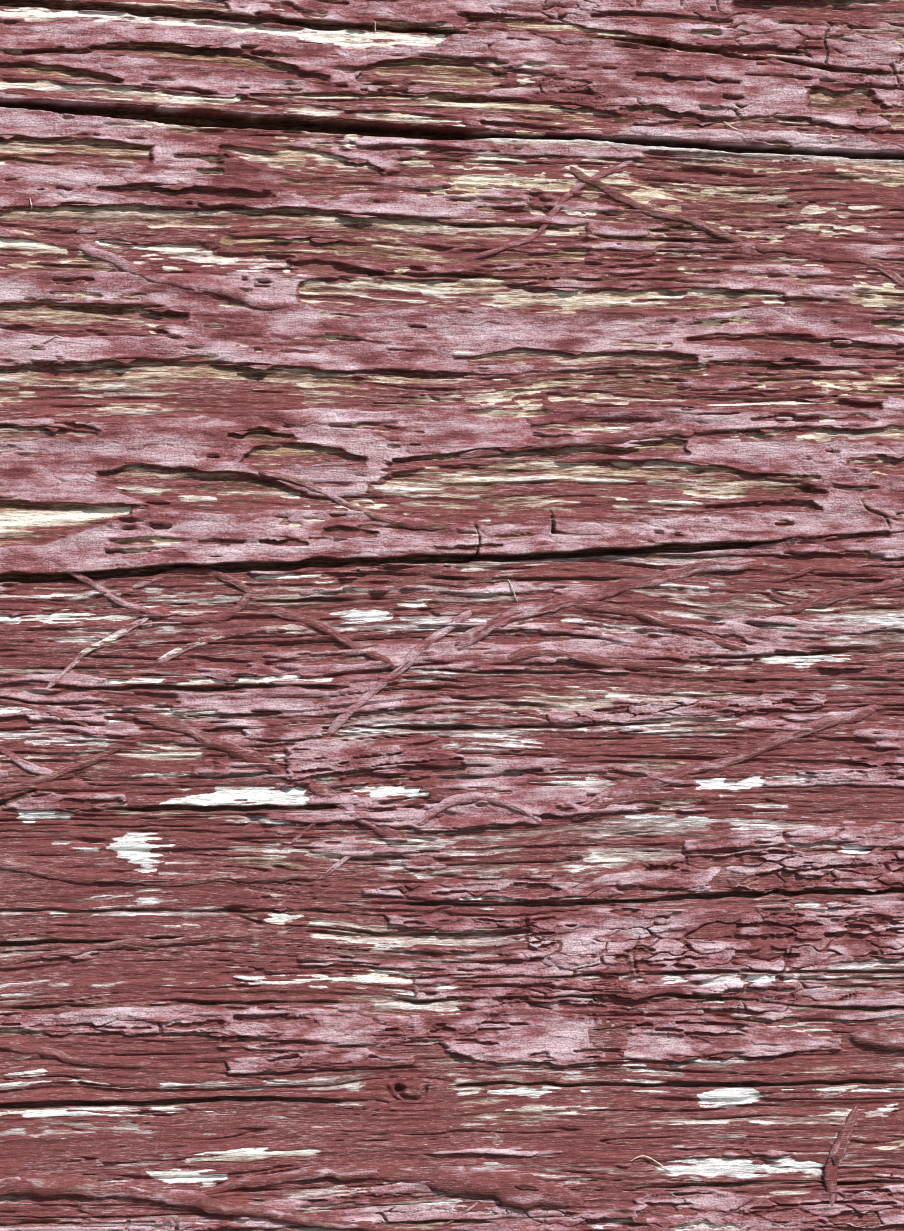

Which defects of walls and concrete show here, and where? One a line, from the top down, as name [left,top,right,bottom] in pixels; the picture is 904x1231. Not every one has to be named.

peeling [0,0,904,133]
crack [581,28,904,76]
peeling [0,184,784,314]
peeling [0,315,904,440]
peeling [372,440,826,524]
crack [0,511,789,603]
peeling [160,783,310,808]
crack [0,827,904,1111]
crack [0,1220,155,1228]
crack [383,1215,576,1224]
peeling [650,1157,824,1178]
crack [633,1180,904,1228]